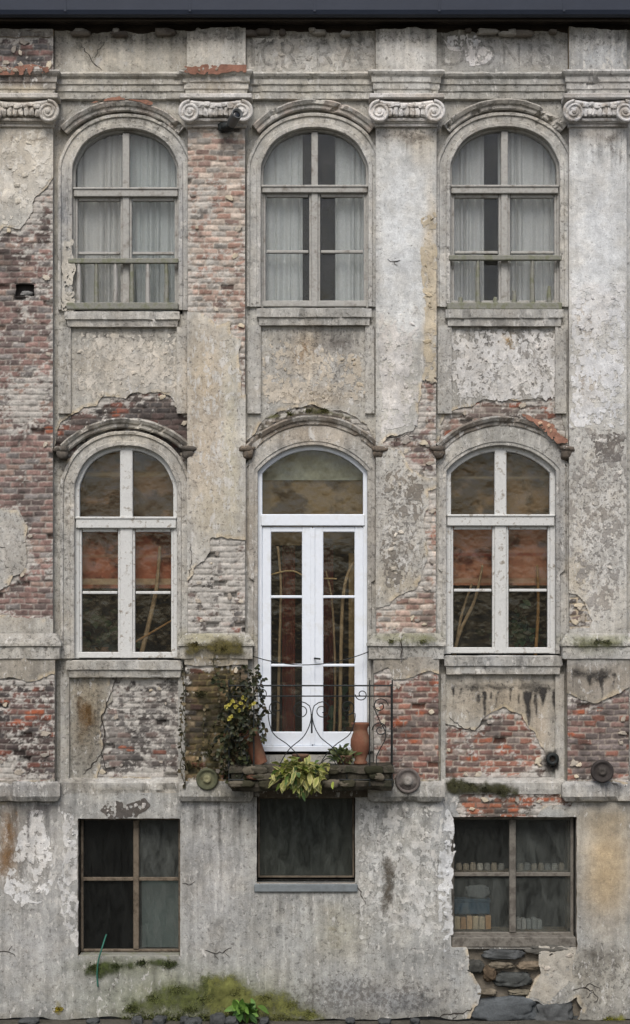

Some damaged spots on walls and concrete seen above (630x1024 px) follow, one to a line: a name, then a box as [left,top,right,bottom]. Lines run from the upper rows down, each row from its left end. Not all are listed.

flaking render [188,128,245,396]
flaking render [0,128,187,619]
peeling [246,212,627,633]
flaking render [188,537,245,633]
flaking render [0,674,55,781]
crack [84,682,115,774]
flaking render [97,664,247,782]
flaking render [374,667,551,781]
leakage [452,685,555,725]
flaking render [567,688,629,782]
peeling [4,810,79,947]
flaking render [529,946,576,1004]